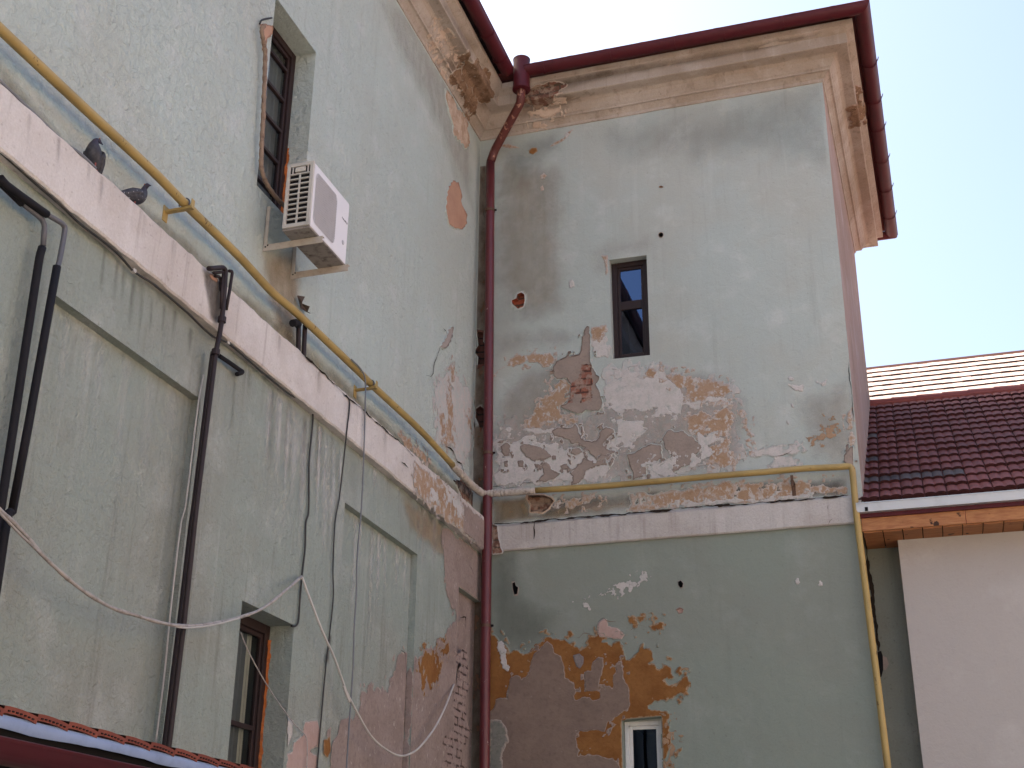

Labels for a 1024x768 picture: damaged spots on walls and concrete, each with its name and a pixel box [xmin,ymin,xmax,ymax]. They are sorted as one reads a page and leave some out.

spalling [431,37,496,121]
flaking render [524,81,568,132]
spalling [445,180,467,231]
spalling [511,291,526,309]
spalling [806,407,858,465]
peeling [285,324,848,768]